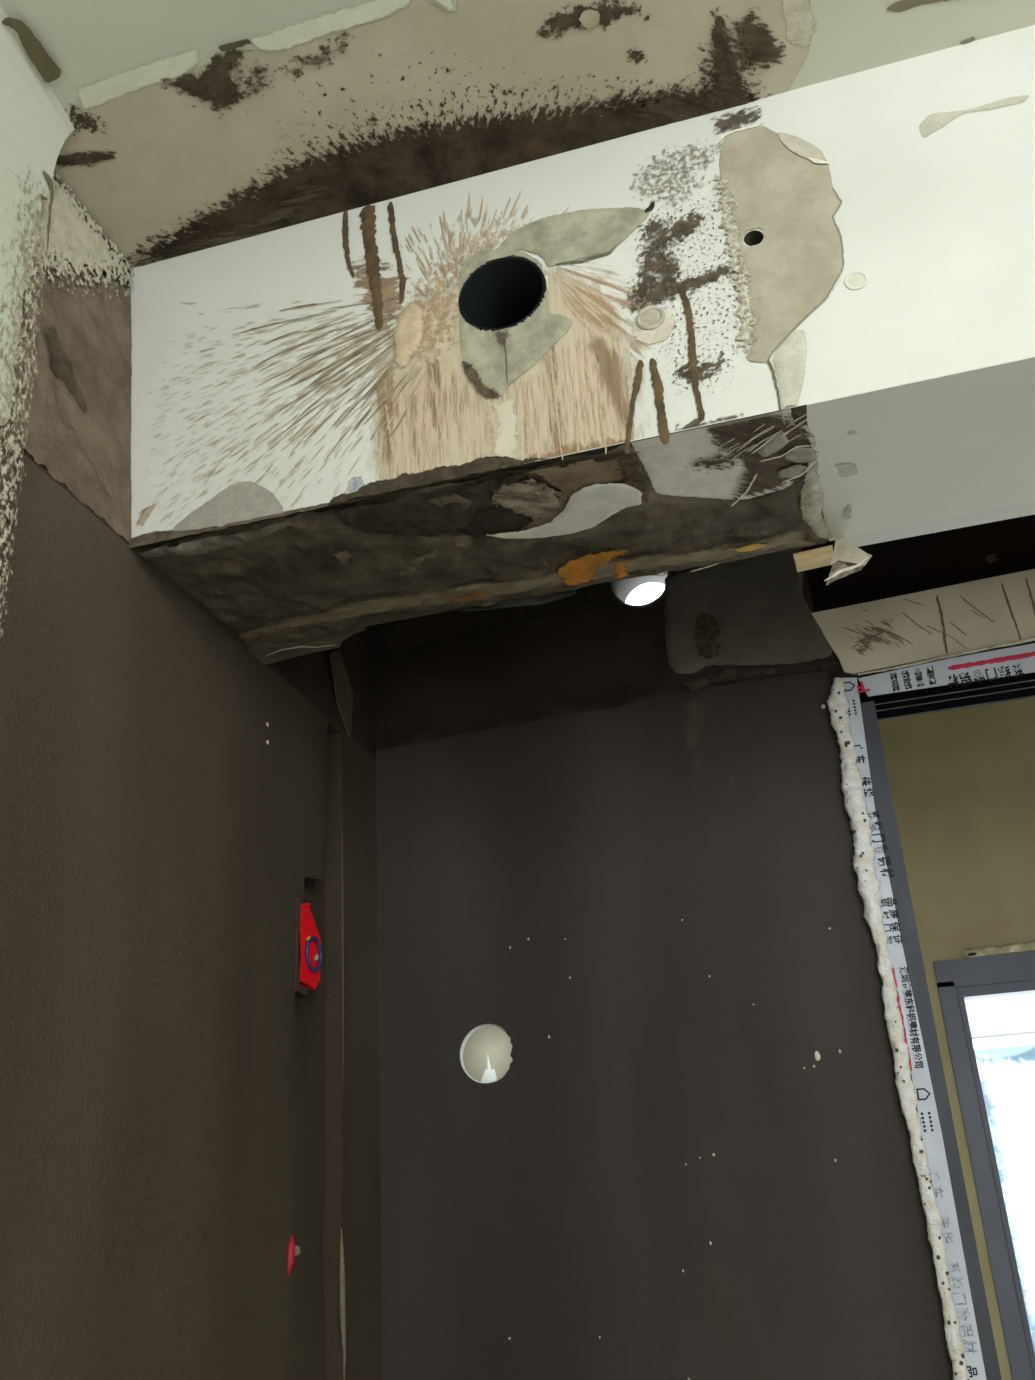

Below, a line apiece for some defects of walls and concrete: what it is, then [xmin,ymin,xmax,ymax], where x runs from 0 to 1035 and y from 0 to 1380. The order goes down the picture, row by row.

leakage [536,0,649,40]
peeling [886,0,949,12]
leakage [123,28,771,528]
peeling [0,0,872,664]
corrosion [557,550,629,586]